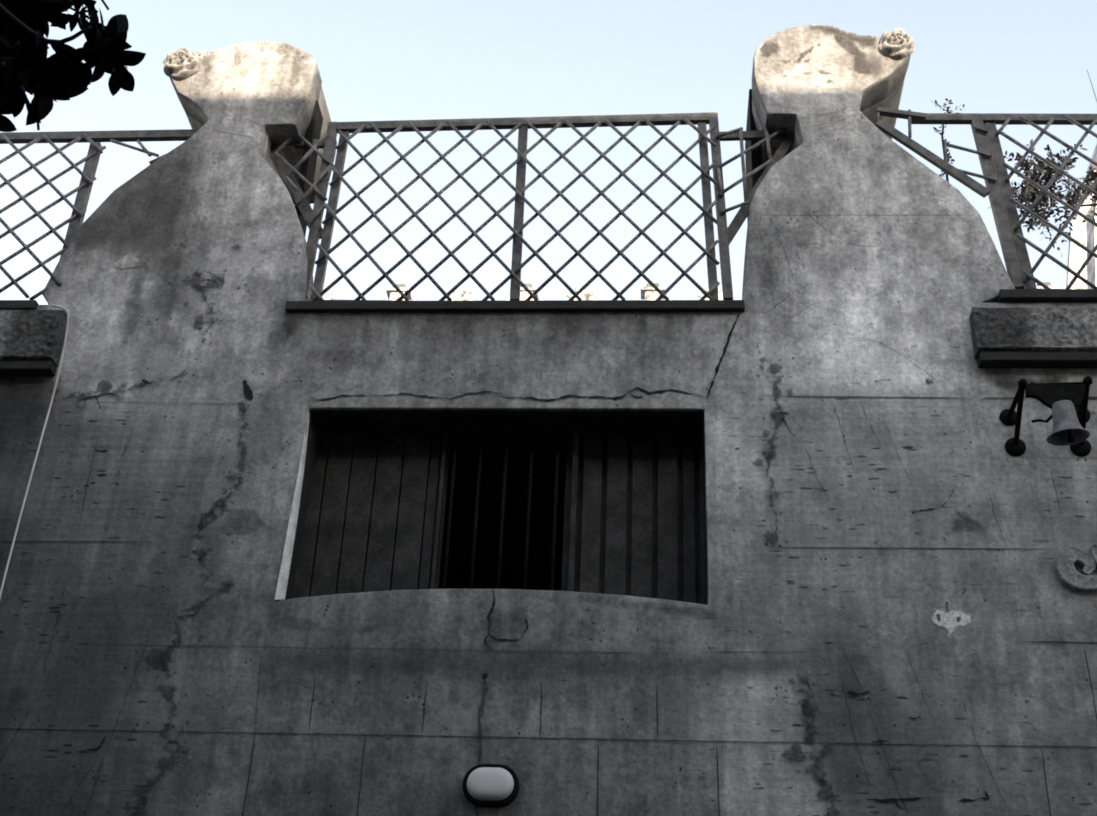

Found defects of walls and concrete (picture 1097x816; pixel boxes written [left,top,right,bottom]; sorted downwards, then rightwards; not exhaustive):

crack [314,311,740,402]
crack [484,591,529,652]
crack [830,690,869,698]